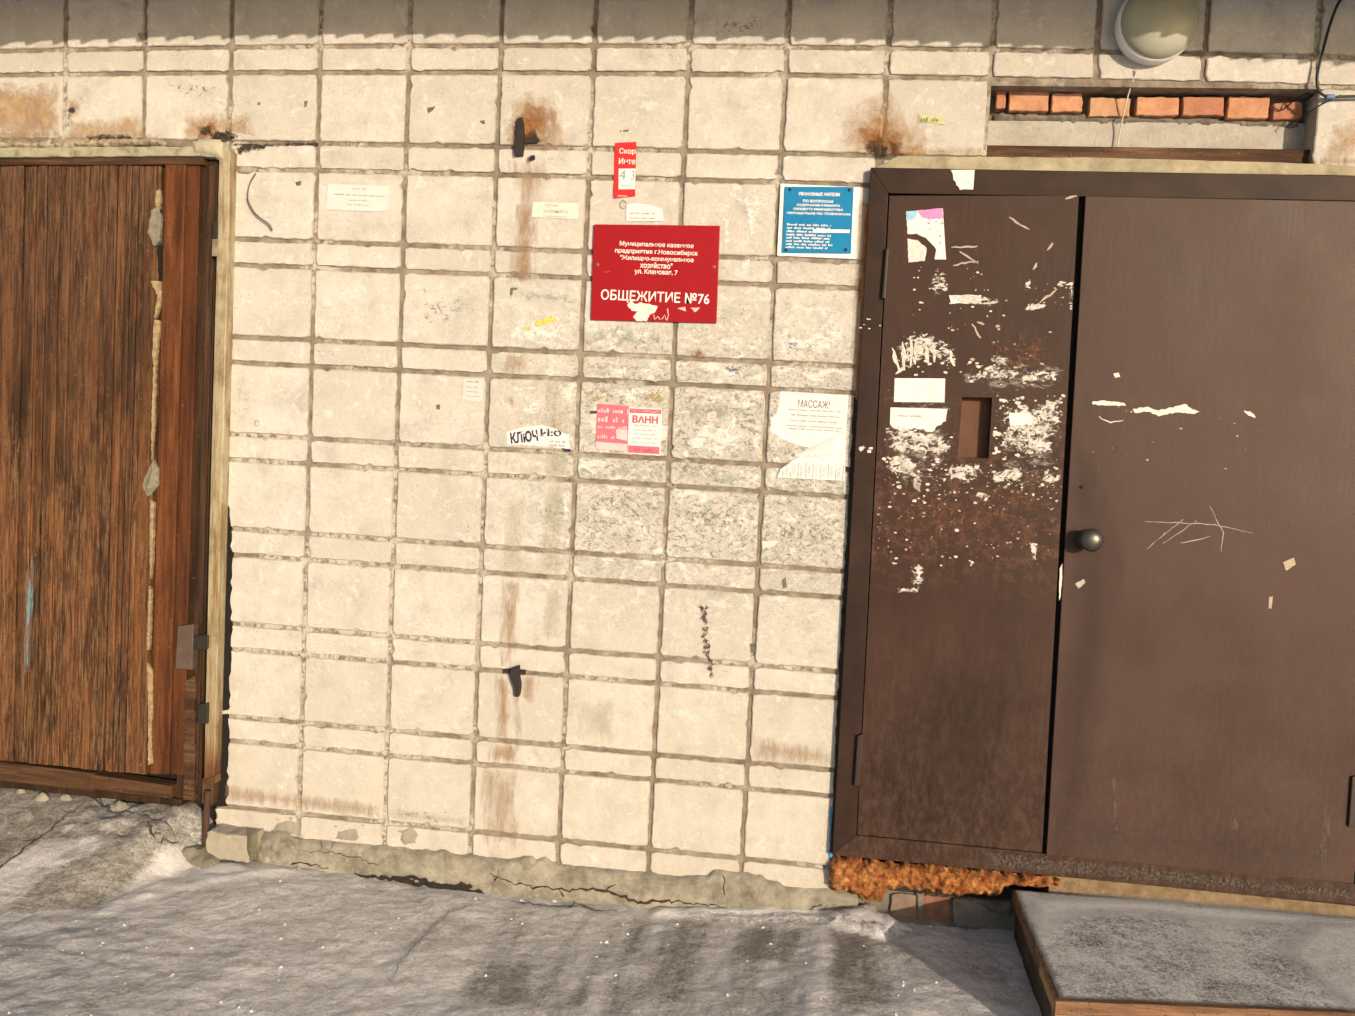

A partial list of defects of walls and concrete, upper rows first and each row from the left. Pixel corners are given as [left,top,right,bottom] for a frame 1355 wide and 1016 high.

rust [0,85,142,141]
rust [187,118,319,155]
rust [514,103,558,196]
rust [852,109,925,159]
rust [496,747,513,760]
crack [291,841,725,982]